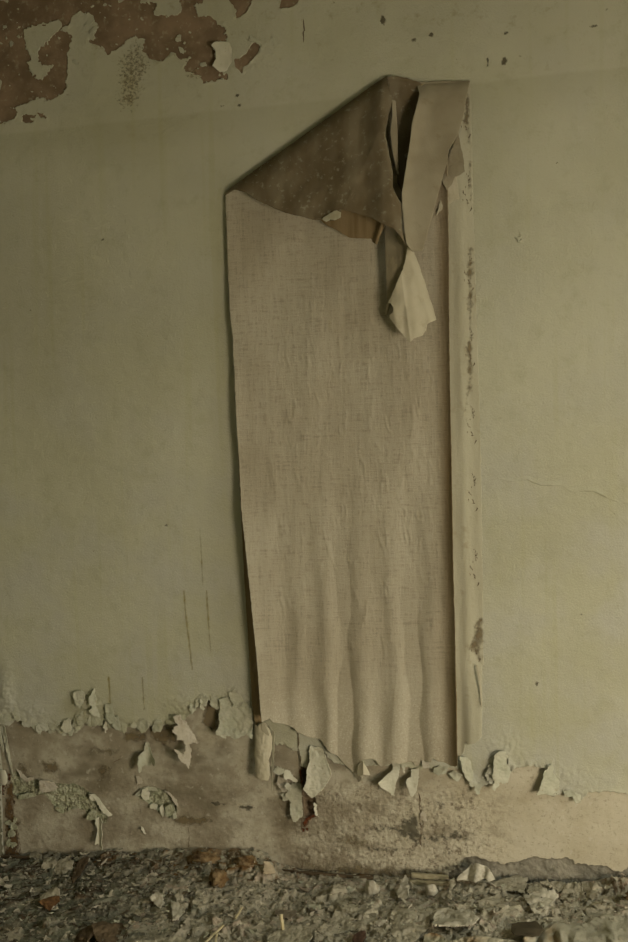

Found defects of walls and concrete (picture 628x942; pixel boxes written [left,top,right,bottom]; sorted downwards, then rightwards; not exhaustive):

peeling [0,0,275,124]
flaking render [0,688,628,900]